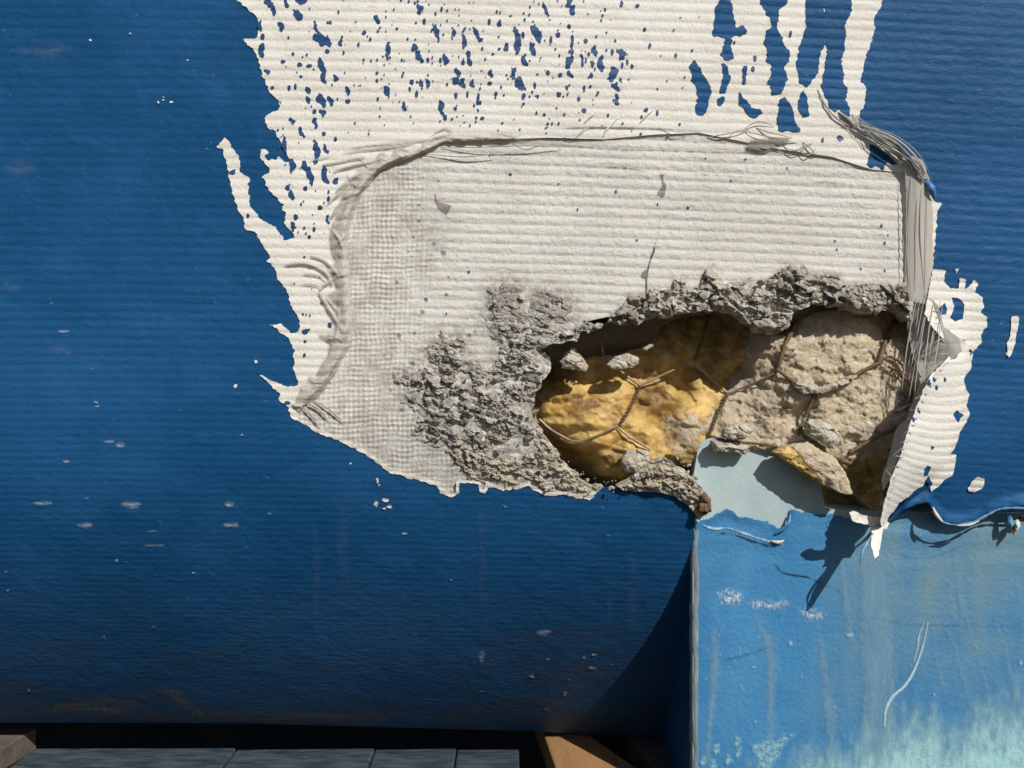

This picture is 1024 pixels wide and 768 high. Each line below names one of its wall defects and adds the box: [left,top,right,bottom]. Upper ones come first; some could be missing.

spalling [216,0,914,547]
peeling [967,477,985,492]